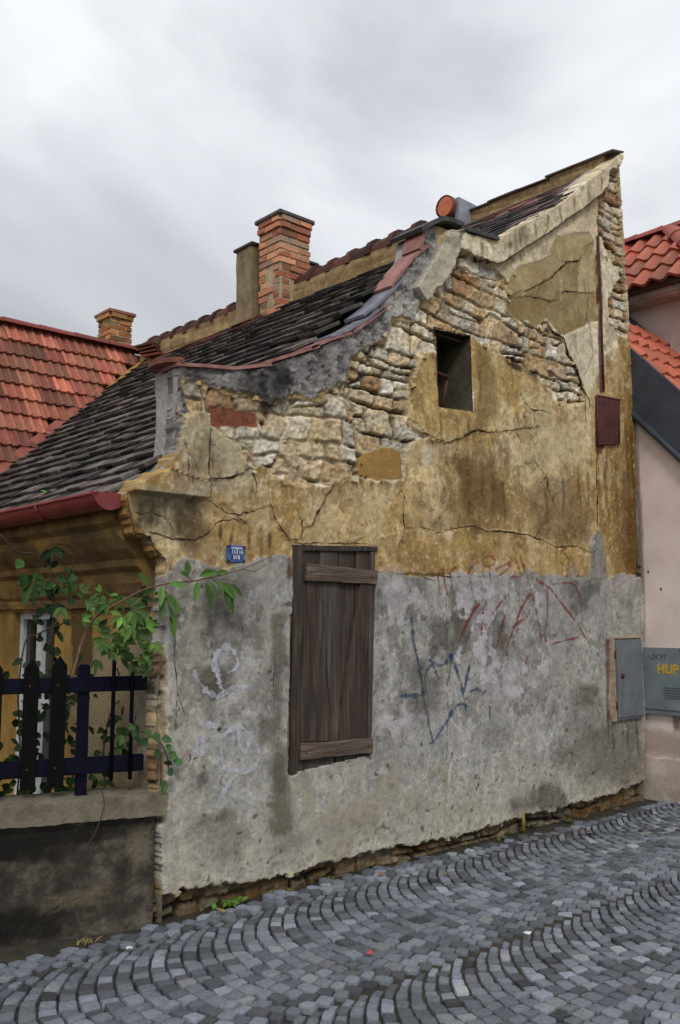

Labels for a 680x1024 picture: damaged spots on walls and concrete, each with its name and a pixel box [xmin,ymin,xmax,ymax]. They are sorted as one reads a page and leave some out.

spalling [183,165,629,487]
crack [515,242,595,421]
crack [408,395,556,507]
crack [136,413,592,837]
spalling [152,784,640,921]